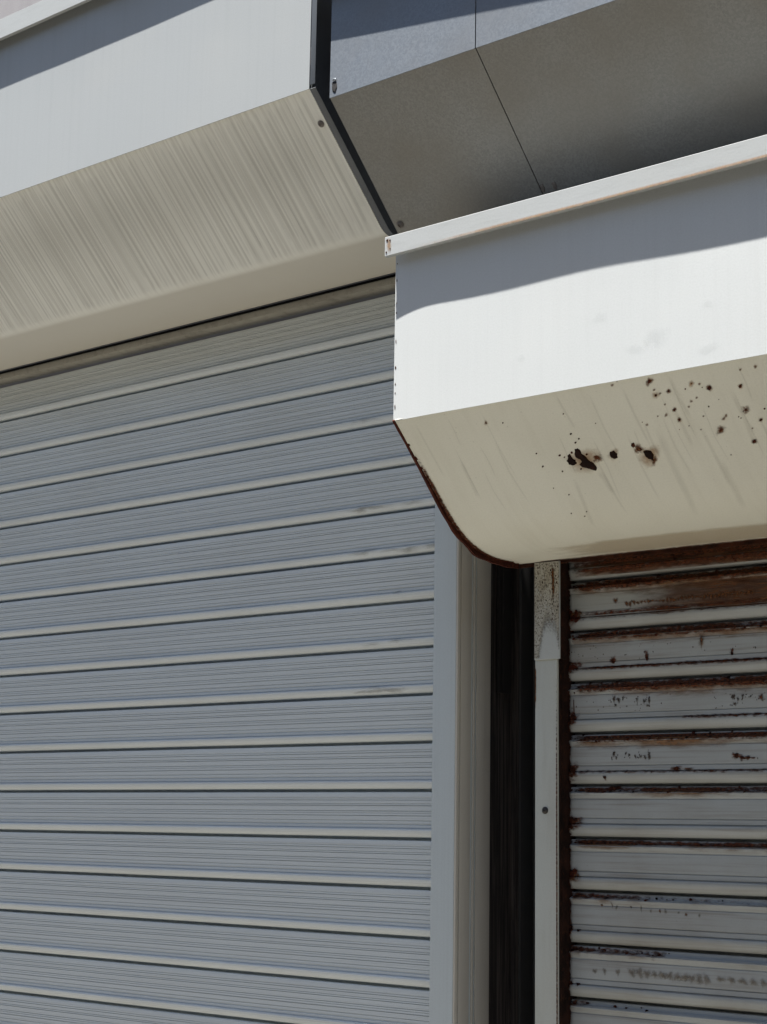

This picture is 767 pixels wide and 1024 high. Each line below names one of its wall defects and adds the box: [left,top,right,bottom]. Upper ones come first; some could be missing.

rust [642,379,719,430]
rust [559,433,601,472]
rust [631,443,657,464]
rust [408,444,519,565]
rust [543,538,767,1024]